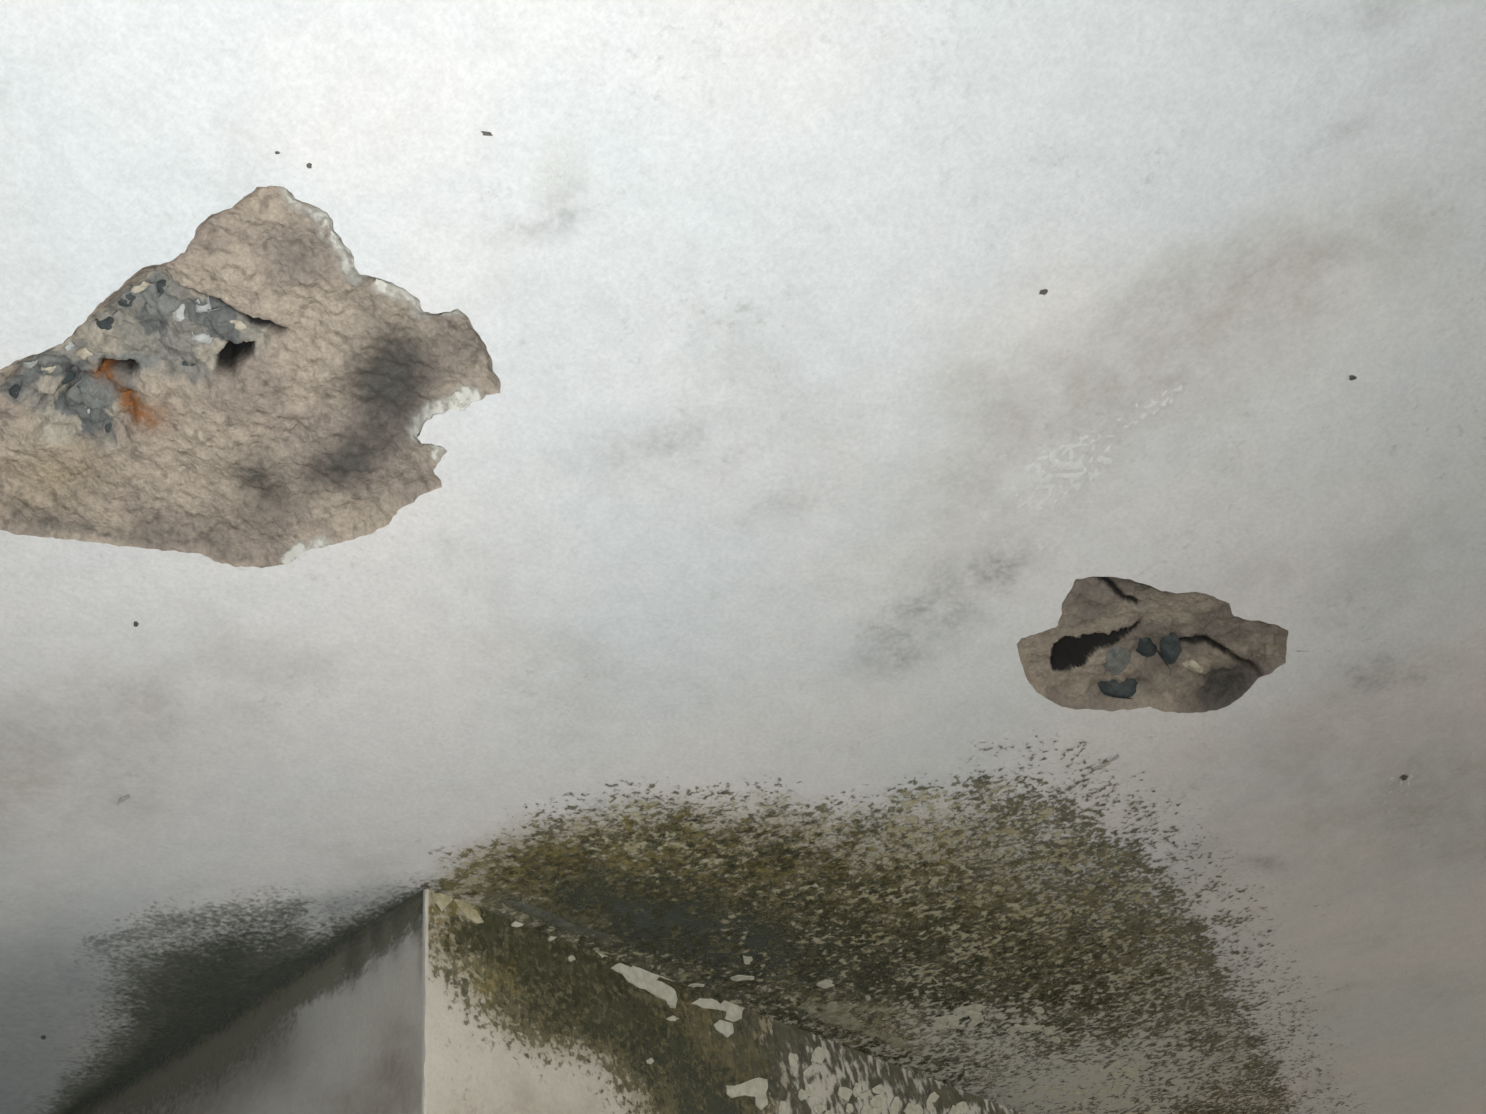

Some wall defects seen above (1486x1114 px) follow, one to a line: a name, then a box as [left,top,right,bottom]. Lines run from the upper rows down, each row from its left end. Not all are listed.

spalling [0,185,501,568]
spalling [1017,576,1300,713]
damp [51,736,1356,1114]
peeling [599,953,744,1038]
peeling [730,956,754,981]
peeling [817,979,835,989]
peeling [932,1004,987,1030]
peeling [1006,1006,1060,1043]
peeling [726,1046,969,1114]